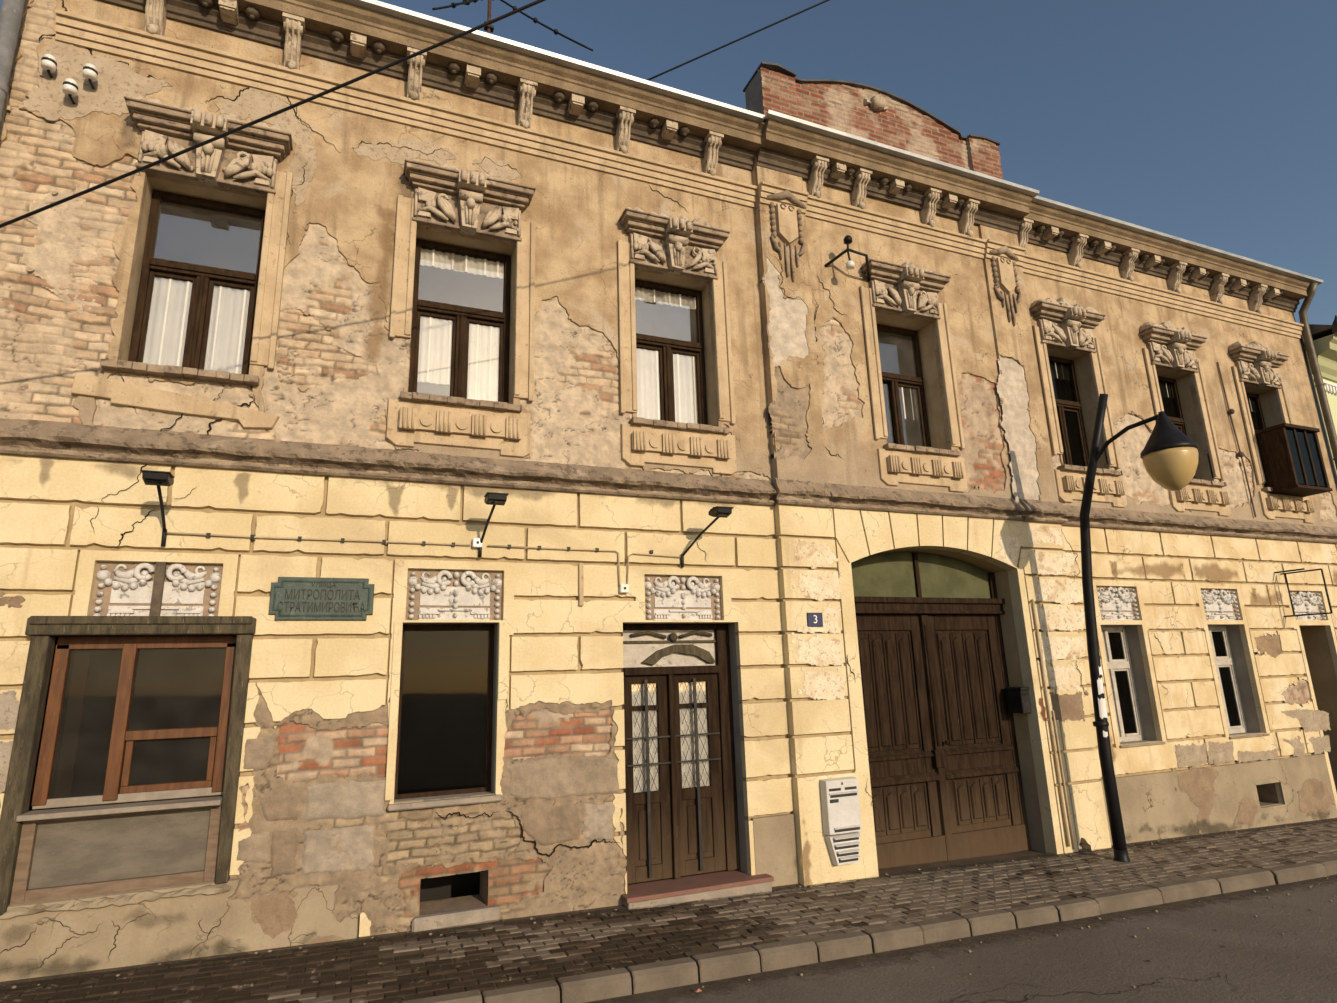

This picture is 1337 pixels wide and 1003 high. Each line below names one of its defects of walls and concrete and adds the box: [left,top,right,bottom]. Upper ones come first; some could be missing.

flaking render [0,0,418,451]
crack [118,374,255,435]
spalling [520,297,770,480]
spalling [762,258,864,460]
crack [90,464,197,548]
spalling [956,356,1094,722]
peeling [0,691,19,808]
spalling [232,684,627,939]
crack [0,913,148,972]
crack [190,903,230,961]
peeling [308,935,346,946]